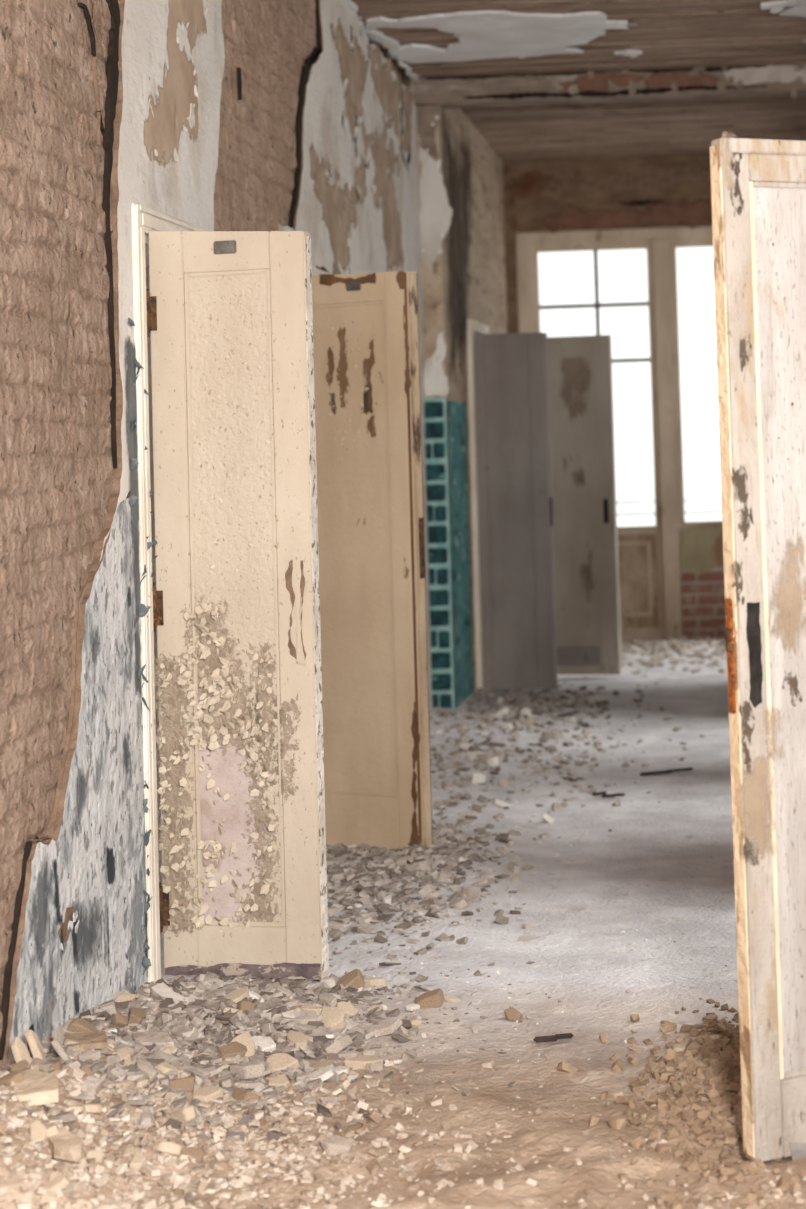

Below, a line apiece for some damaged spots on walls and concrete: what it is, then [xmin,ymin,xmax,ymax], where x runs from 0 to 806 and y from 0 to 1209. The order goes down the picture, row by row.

water stain [444,129,472,370]
flaking render [0,0,300,1038]
flaking render [144,0,637,973]
peeling [772,538,806,652]
peeling [782,672,803,706]